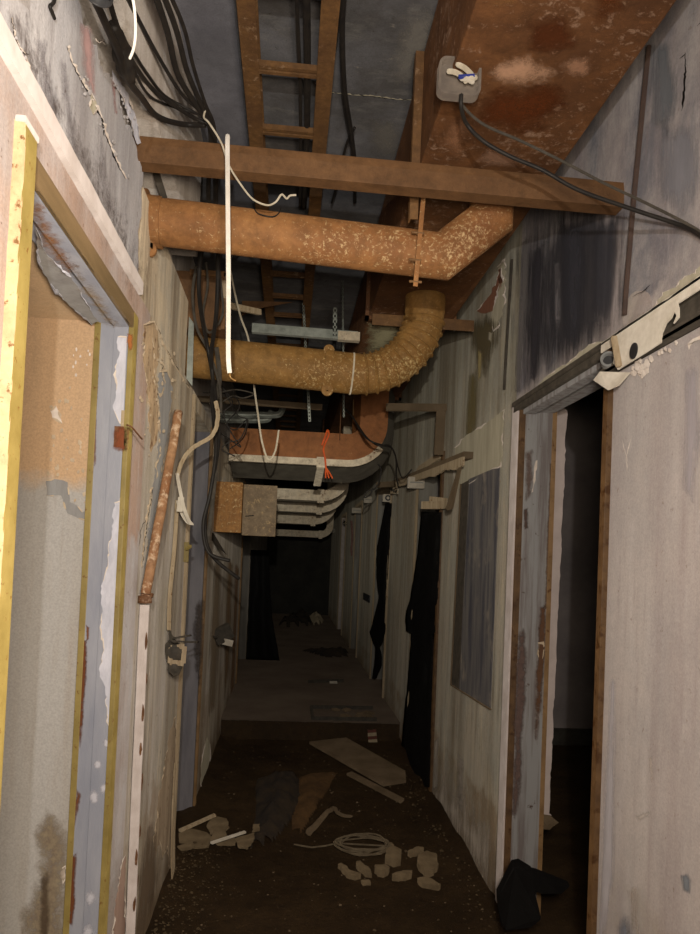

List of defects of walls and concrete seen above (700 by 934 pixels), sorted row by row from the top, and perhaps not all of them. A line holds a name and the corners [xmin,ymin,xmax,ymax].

peeling [477,259,506,332]
peeling [113,336,127,424]
peeling [630,336,700,379]
peeling [139,321,176,569]
peeling [99,501,120,725]
water stain [25,816,65,934]